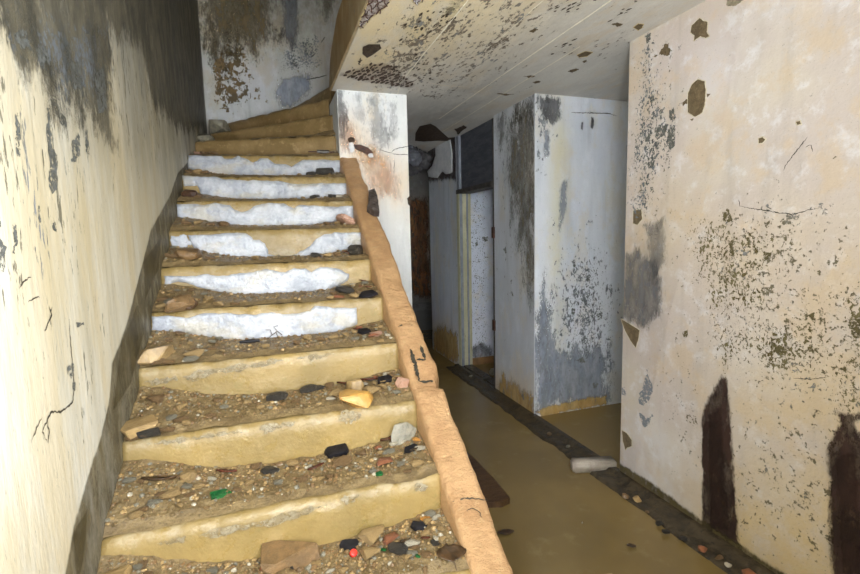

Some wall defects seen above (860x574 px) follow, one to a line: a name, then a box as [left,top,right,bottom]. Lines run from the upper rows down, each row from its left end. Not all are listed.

damp [0,0,298,148]
damp [276,75,311,107]
peeling [627,33,710,226]
crack [20,277,74,443]
flaking render [152,306,357,340]
flaking render [164,267,349,294]
flaking render [170,155,361,257]
damp [497,95,612,416]
damp [623,219,662,327]
damp [701,378,739,544]
damp [827,414,860,574]